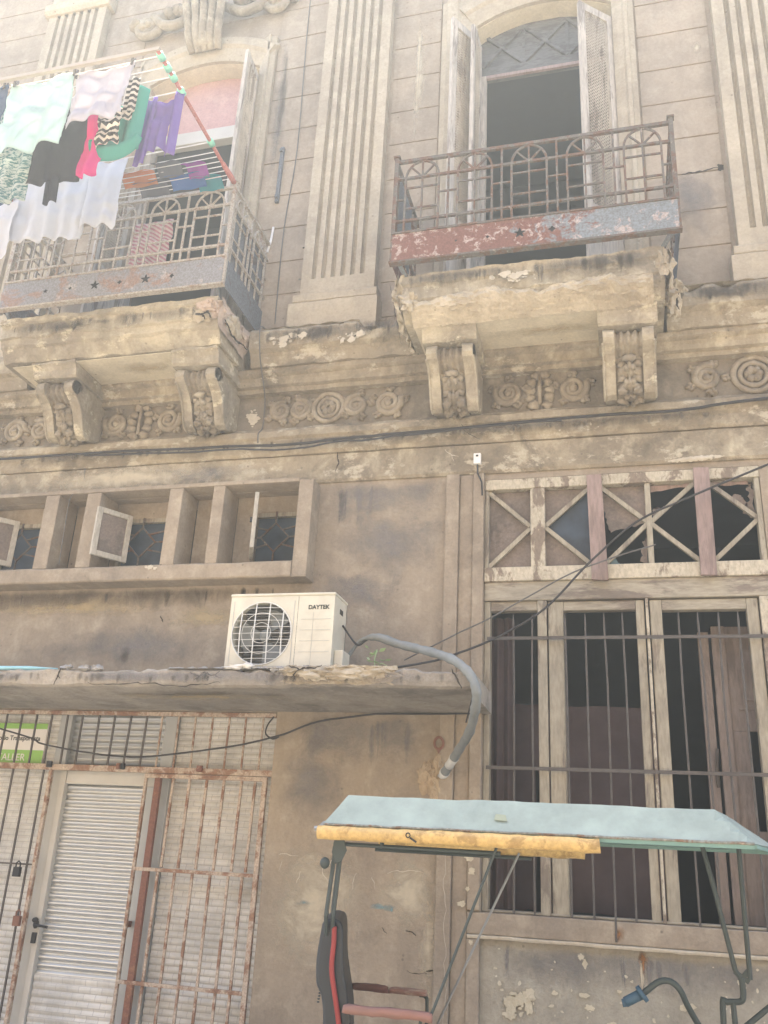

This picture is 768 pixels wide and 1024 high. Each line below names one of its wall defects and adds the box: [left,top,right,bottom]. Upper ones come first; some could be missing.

spalling [191,296,250,359]
peeling [262,319,366,348]
spalling [391,247,768,355]
crack [88,672,231,695]
spalling [168,663,403,686]
crack [289,665,322,679]
peeling [493,967,538,1024]
peeling [571,953,595,1019]